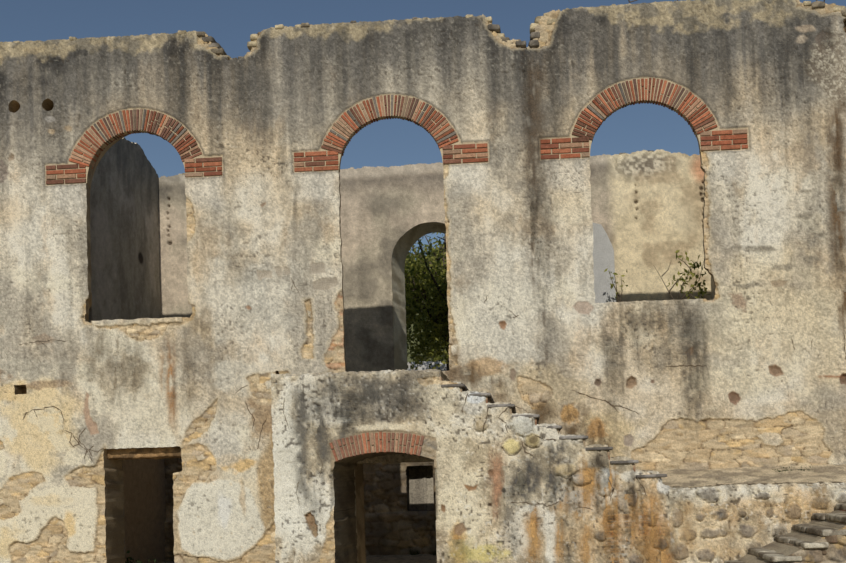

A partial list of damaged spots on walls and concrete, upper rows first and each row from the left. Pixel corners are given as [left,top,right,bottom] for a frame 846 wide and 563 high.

water stain [526,68,542,188]
water stain [833,109,842,170]
water stain [831,187,844,251]
spalling [243,368,291,406]
spalling [728,390,742,406]
spalling [173,396,221,516]
spalling [622,408,835,471]
spalling [0,444,108,563]
corrosion [527,511,540,556]
corrosion [603,471,669,563]